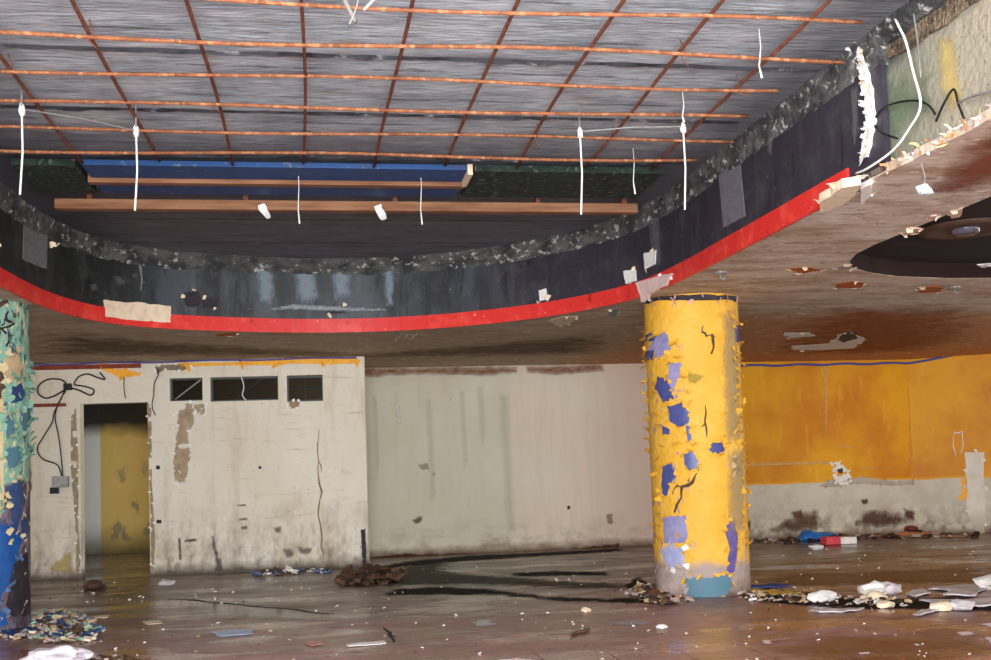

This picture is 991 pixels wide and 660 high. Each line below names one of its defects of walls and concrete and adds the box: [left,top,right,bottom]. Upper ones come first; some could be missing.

spalling [0,0,863,171]
corrosion [940,38,960,108]
peeling [816,175,877,213]
spalling [897,207,963,238]
peeling [171,400,208,487]
peeling [623,248,752,605]
crack [316,432,324,567]
crack [672,469,699,513]
water stain [775,510,818,532]
peeling [818,461,915,488]
water stain [856,499,914,527]